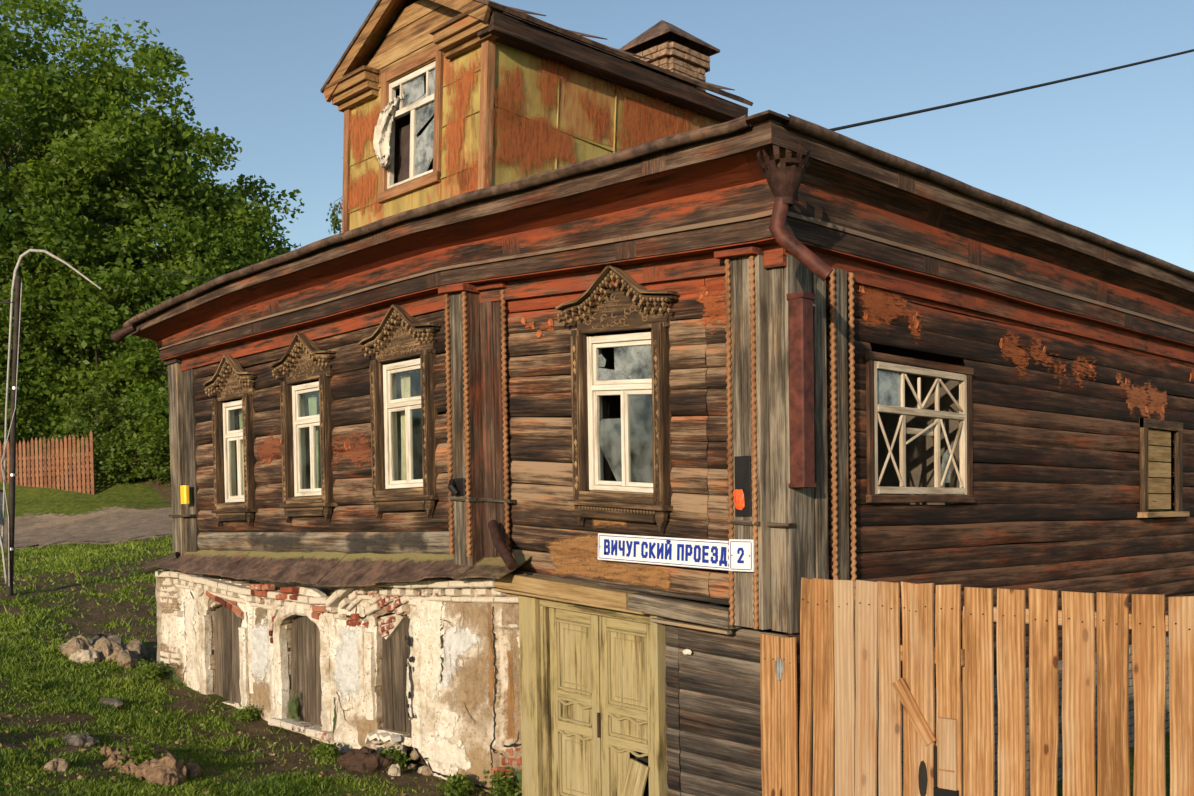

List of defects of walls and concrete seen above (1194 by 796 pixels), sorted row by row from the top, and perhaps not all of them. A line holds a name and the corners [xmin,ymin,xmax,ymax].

peeling [856,284,923,339]
peeling [999,330,1097,388]
peeling [1115,373,1168,420]
peeling [160,578,301,685]
flaking render [311,605,325,620]
flaking render [501,593,520,658]
peeling [332,587,480,774]
spalling [491,748,522,794]